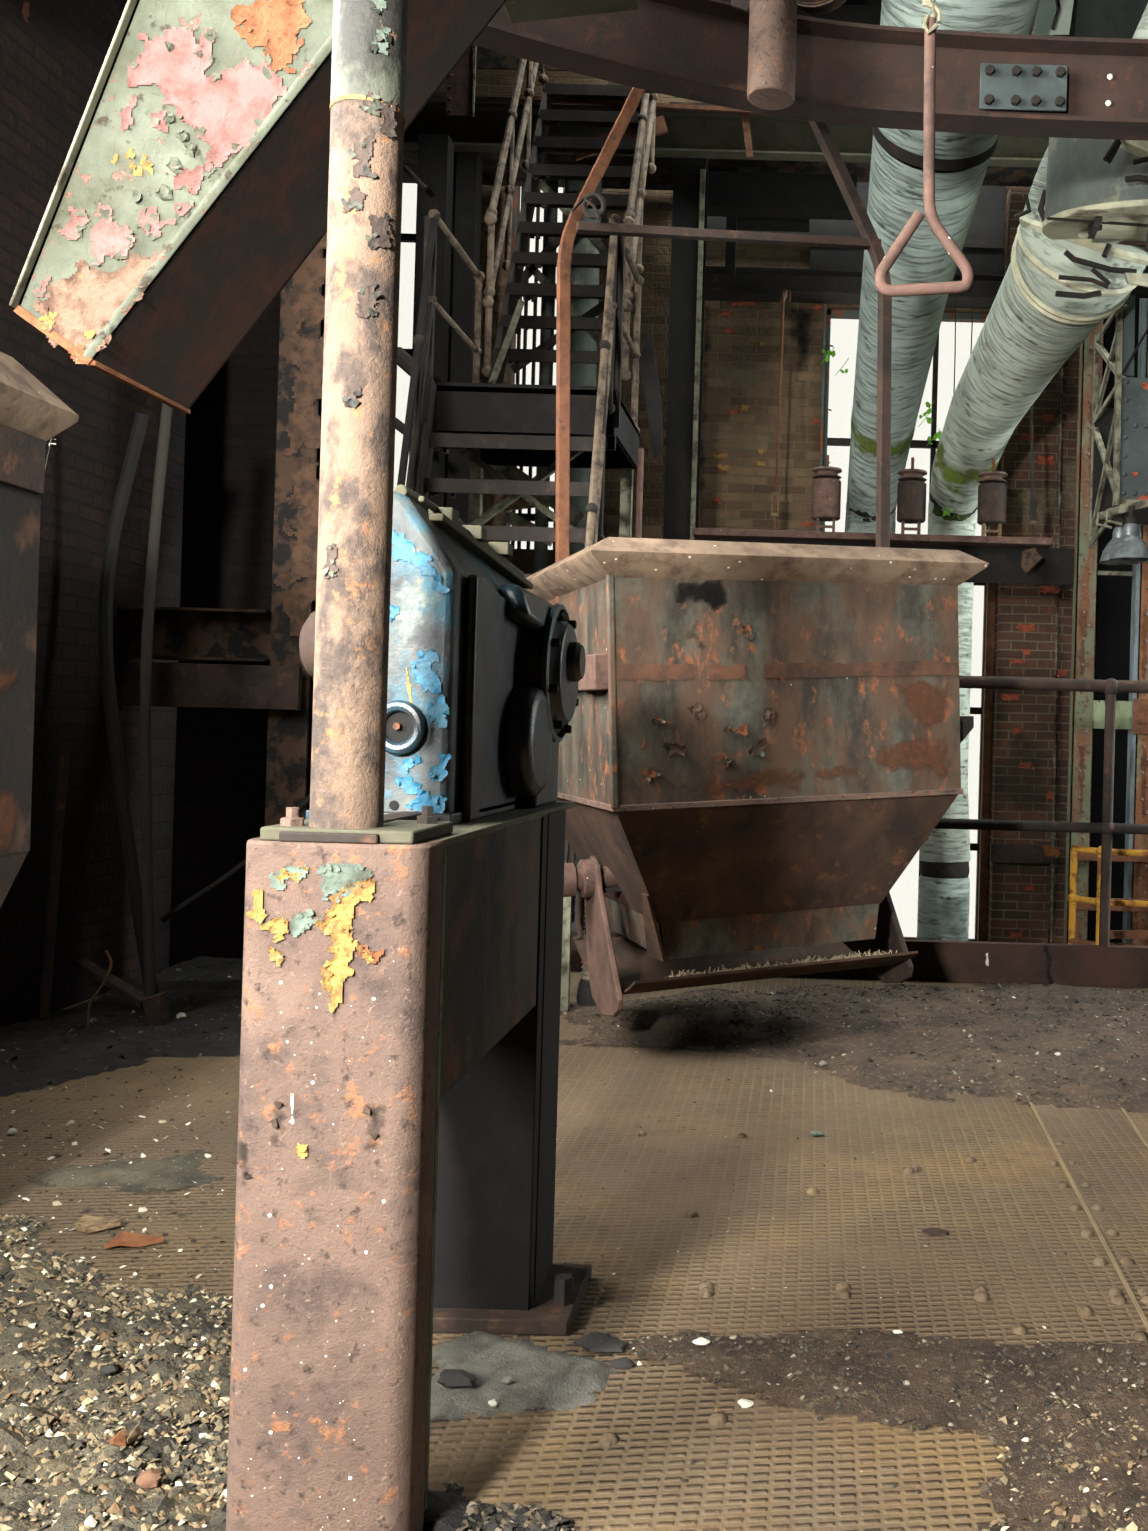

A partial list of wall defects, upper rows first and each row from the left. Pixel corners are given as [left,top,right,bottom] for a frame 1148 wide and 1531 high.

peeling [58,25,287,266]
peeling [33,276,57,330]
peeling [246,861,384,1013]